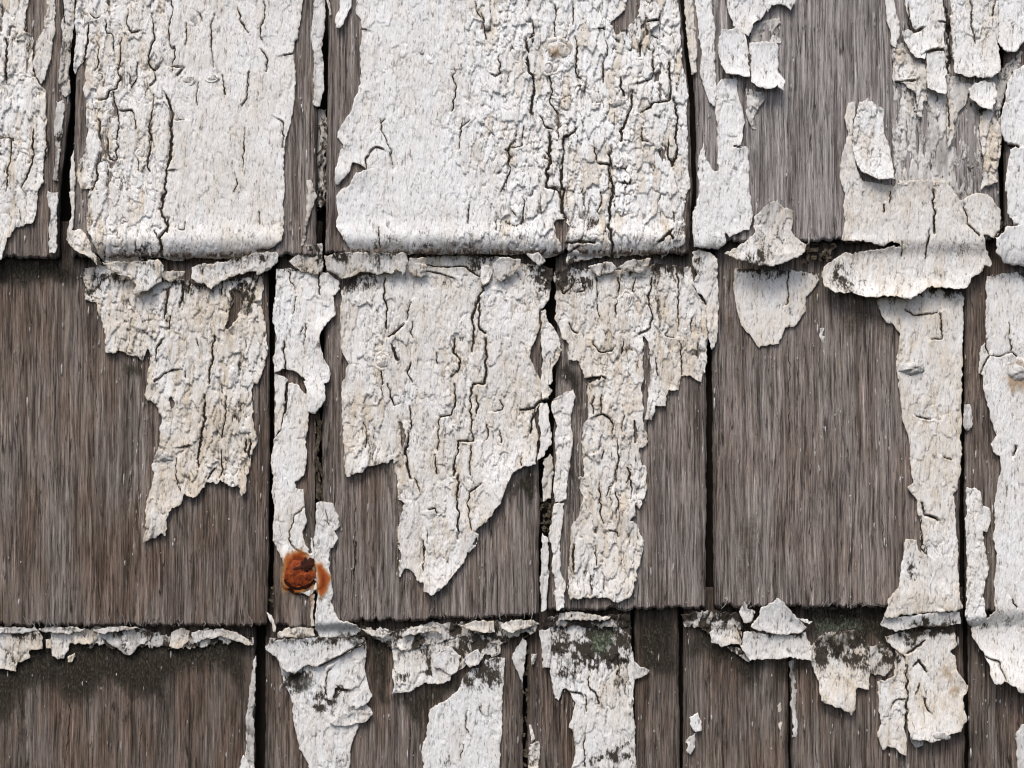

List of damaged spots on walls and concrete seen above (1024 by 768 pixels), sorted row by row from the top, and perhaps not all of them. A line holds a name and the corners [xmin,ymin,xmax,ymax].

crack [4,22,26,84]
crack [2,129,49,192]
peeling [47,191,59,253]
peeling [52,0,304,542]
crack [84,2,293,256]
crack [365,120,393,168]
crack [452,70,469,143]
crack [496,6,692,595]
crack [380,265,551,568]
peeling [265,0,1024,768]
rust [281,548,331,606]
peeling [0,625,257,768]